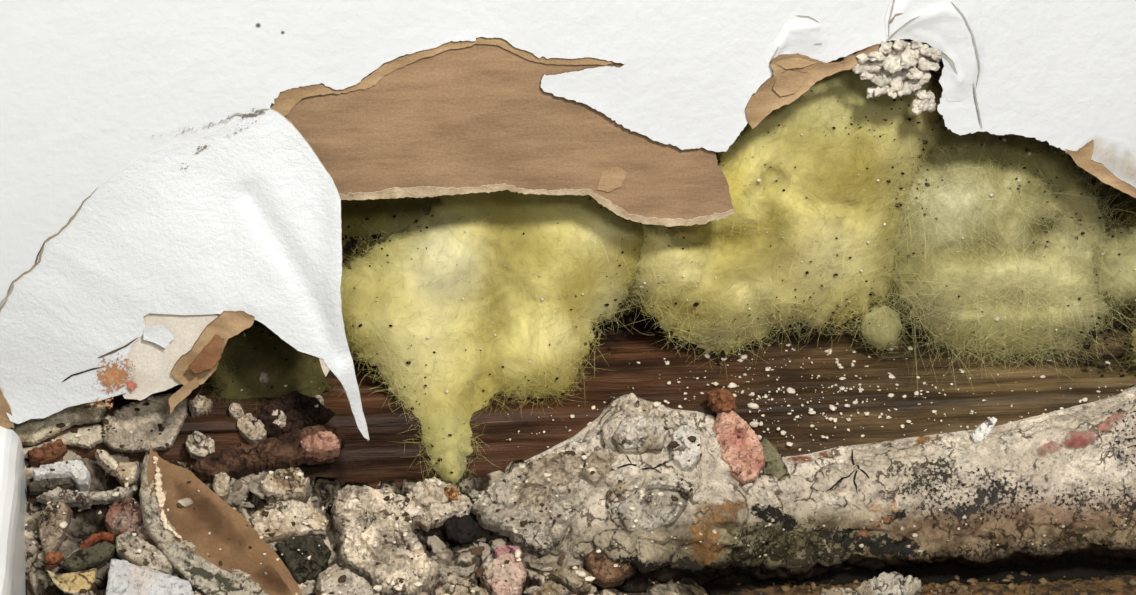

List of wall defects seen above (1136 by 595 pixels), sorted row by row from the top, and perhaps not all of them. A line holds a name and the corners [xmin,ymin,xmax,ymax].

flaking render [851,39,943,116]
damp [342,218,382,260]
peeling [0,37,735,442]
damp [1083,309,1136,377]
peeling [95,450,142,488]
damp [706,388,791,486]
crack [827,450,869,492]
peeling [971,417,998,443]
damp [1039,401,1136,468]
damp [584,456,1136,595]